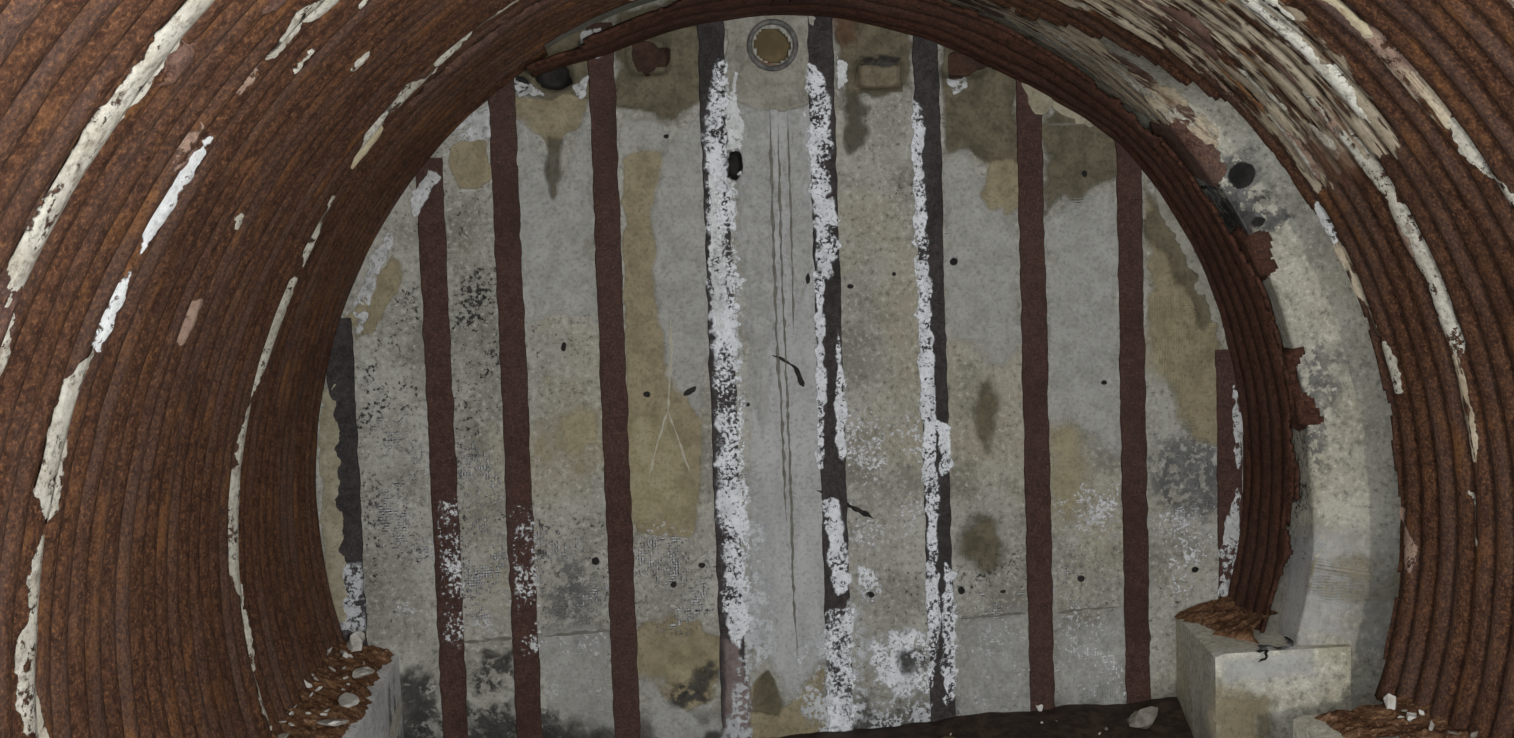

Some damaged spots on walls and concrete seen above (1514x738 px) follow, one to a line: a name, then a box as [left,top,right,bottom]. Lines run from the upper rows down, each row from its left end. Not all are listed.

peeling [14,272,131,738]
peeling [0,0,215,375]
peeling [228,196,336,730]
peeling [236,0,339,95]
water stain [515,28,589,198]
water stain [550,555,591,622]
water stain [615,18,1002,738]
rust [526,0,1324,633]
water stain [940,47,1018,214]
water stain [1042,111,1117,215]
peeling [945,0,1478,462]
peeling [1322,0,1514,204]